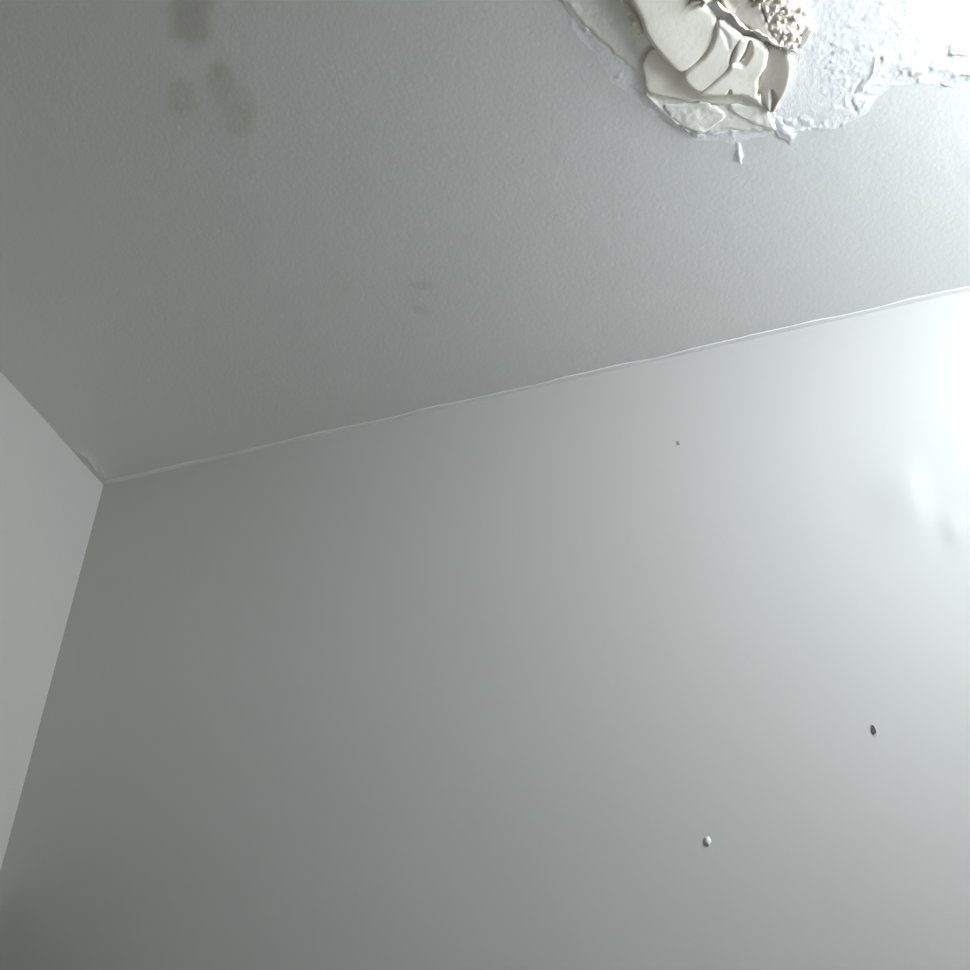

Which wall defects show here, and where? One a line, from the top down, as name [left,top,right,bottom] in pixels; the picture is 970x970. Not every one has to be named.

flaking render [563,0,815,165]